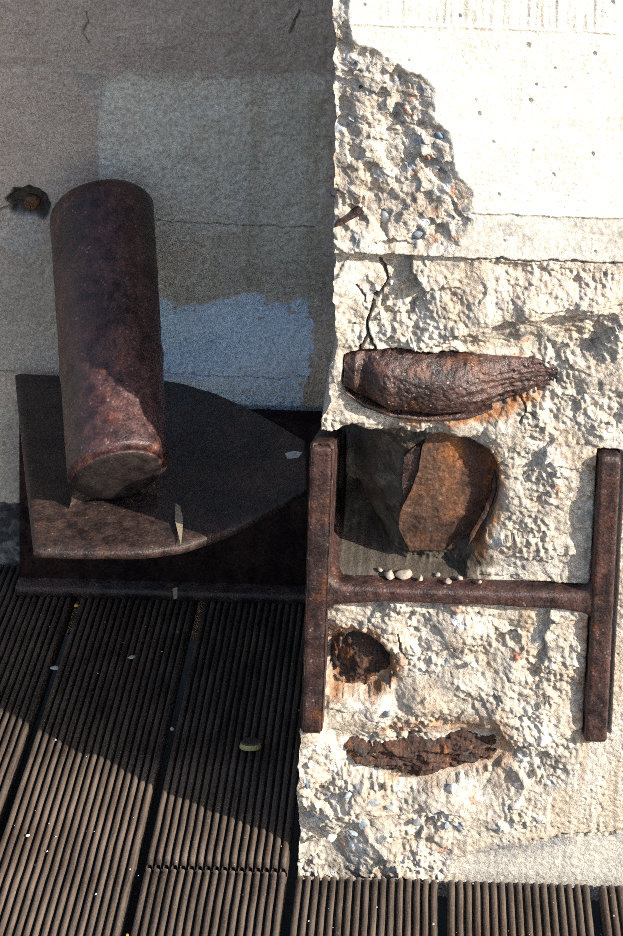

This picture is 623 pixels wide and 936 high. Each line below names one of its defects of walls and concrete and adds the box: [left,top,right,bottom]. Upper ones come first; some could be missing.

flaking render [96,0,476,310]
spalling [5,184,53,222]
crack [355,257,390,348]
rust [397,386,547,433]
spalling [321,315,623,583]
rust [471,444,511,565]
rust [325,622,411,710]
spalling [296,601,585,896]
rust [367,716,520,795]
rust [509,607,538,665]
rust [573,614,592,797]
crack [535,828,623,843]